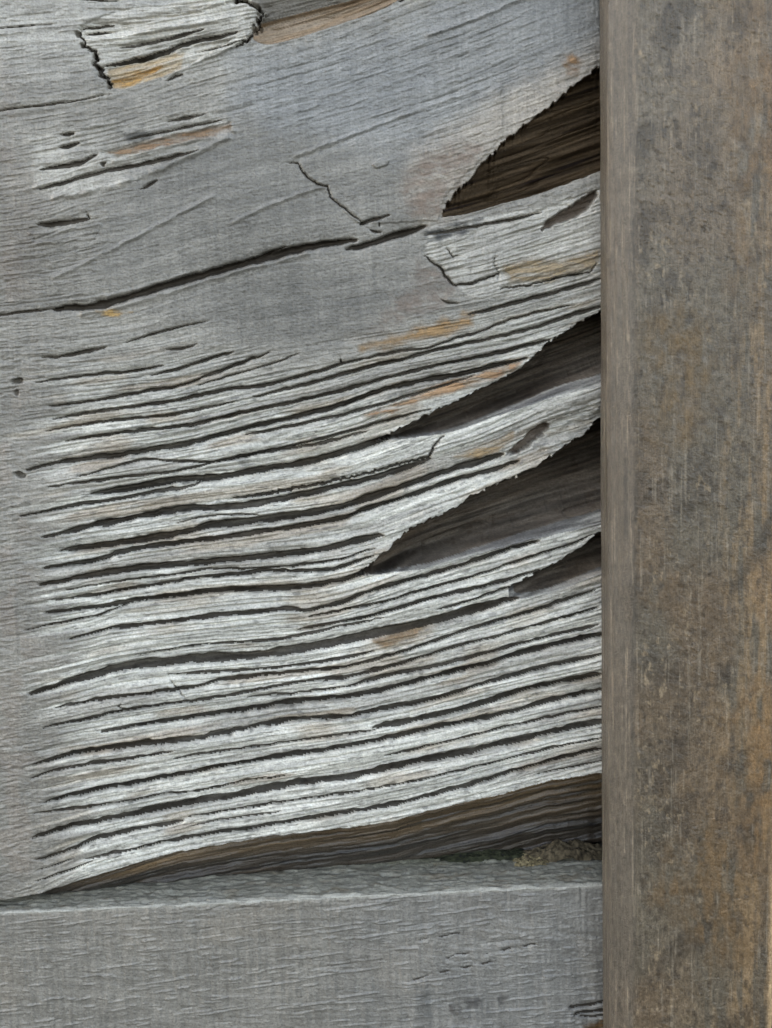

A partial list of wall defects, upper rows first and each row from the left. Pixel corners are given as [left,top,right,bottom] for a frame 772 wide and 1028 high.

crack [0,162,602,881]